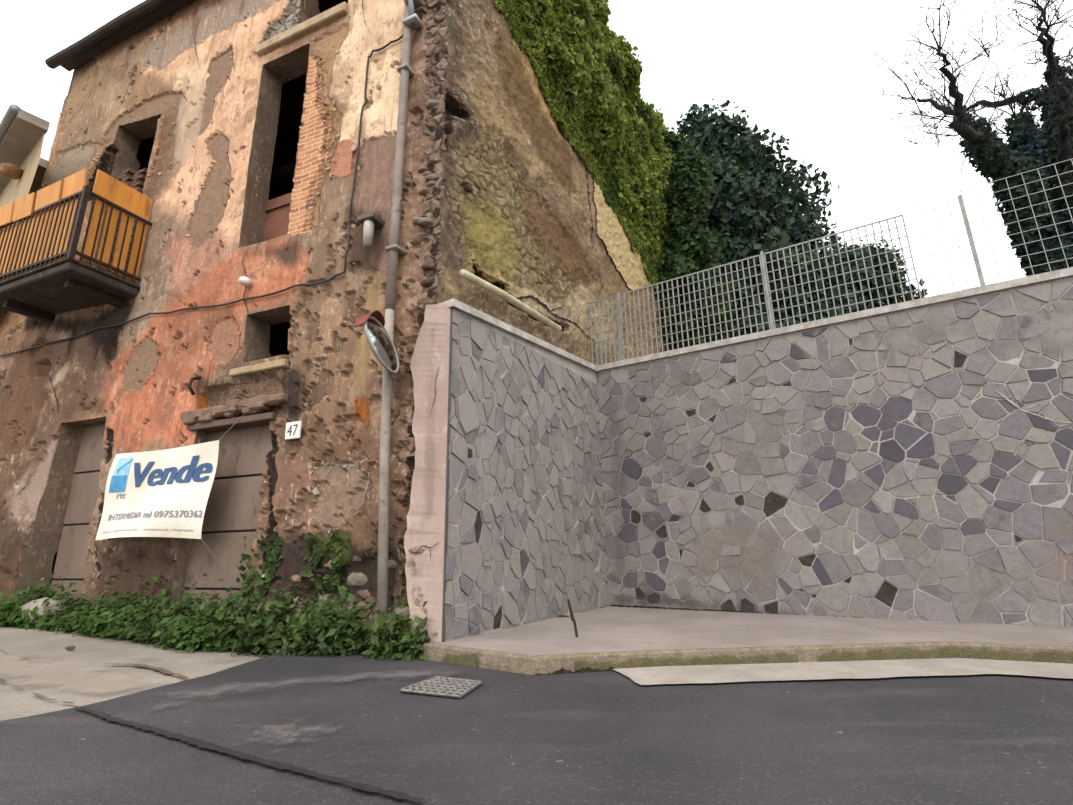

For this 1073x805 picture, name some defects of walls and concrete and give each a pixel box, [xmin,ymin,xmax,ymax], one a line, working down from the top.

flaking render [42,0,300,249]
flaking render [288,22,396,272]
spalling [412,0,597,328]
flaking render [260,431,278,577]
spalling [393,406,425,618]